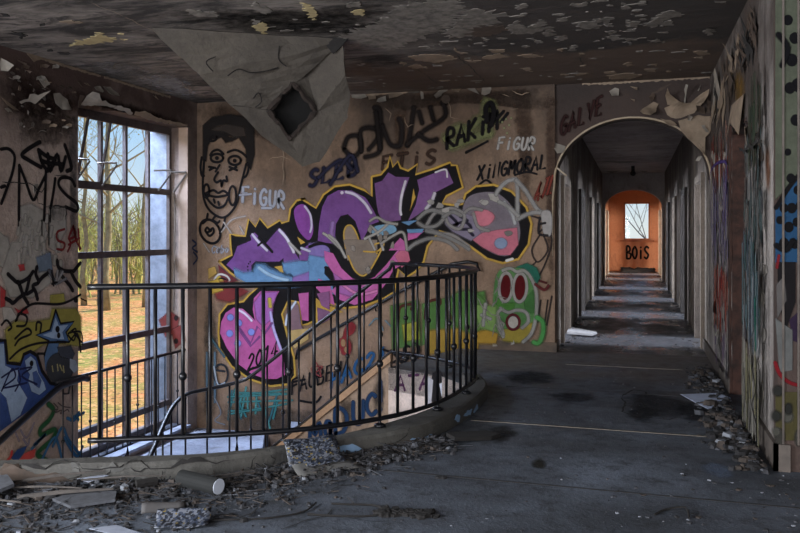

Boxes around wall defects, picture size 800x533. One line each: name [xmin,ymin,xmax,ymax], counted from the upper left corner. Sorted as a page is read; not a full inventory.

peeling [186,9,219,17]
peeling [0,32,187,128]
peeling [249,0,757,394]
spalling [744,184,765,405]
damp [630,395,715,421]
crack [22,457,229,482]